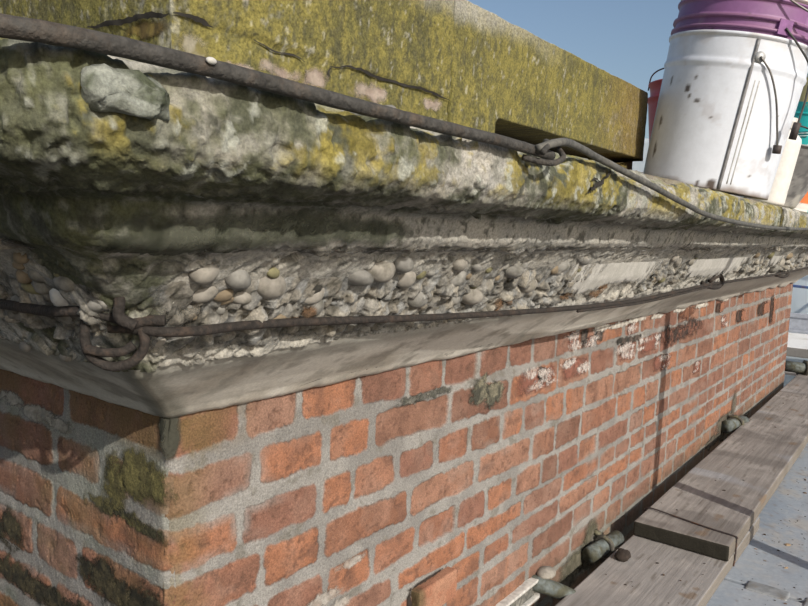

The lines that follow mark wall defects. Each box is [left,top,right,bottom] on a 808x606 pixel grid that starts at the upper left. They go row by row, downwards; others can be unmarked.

crack [87,11,213,29]
crack [253,39,305,62]
crack [328,65,449,100]
spalling [639,248,711,292]
spalling [0,238,108,340]
spalling [150,246,596,349]
peeling [595,298,729,331]
spalling [757,296,776,324]
leakage [618,322,670,371]